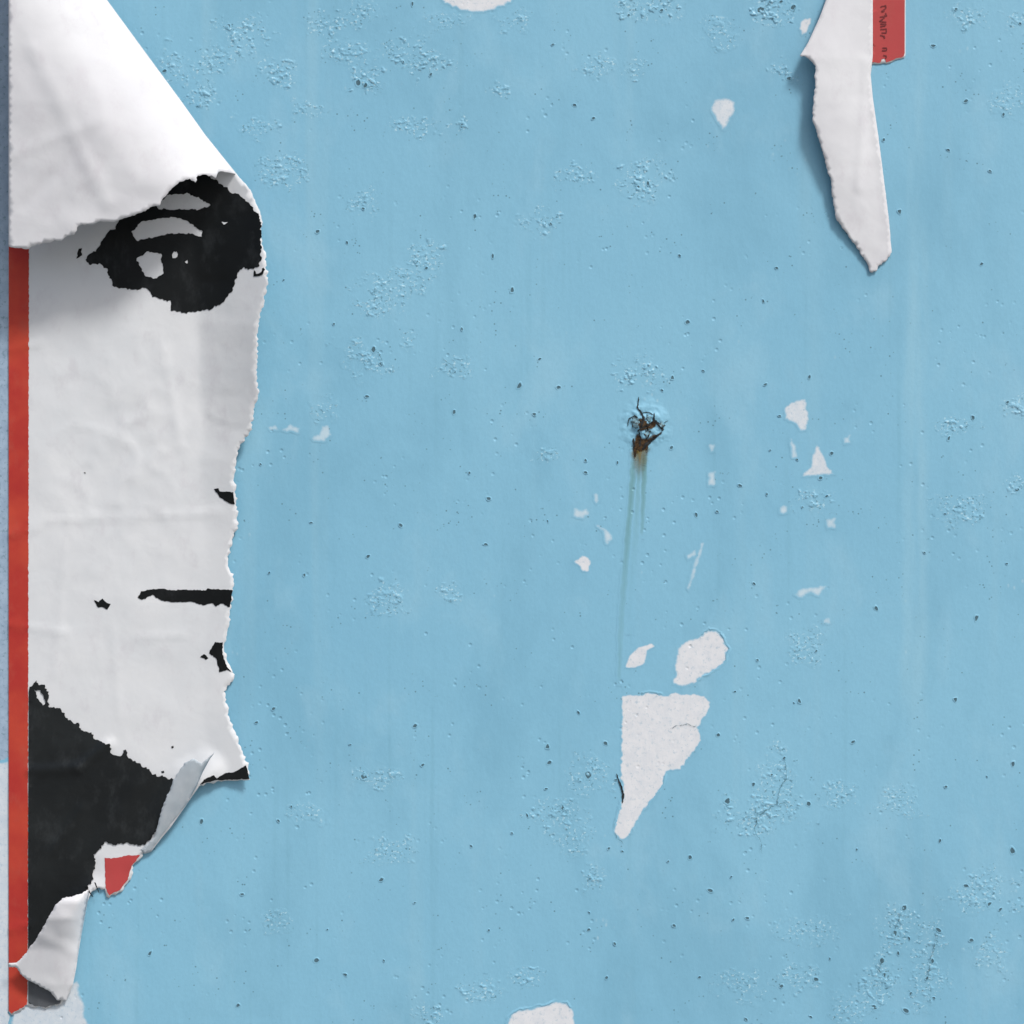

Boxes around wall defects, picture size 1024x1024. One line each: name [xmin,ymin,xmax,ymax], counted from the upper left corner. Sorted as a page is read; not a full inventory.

peeling [441,0,514,13]
peeling [709,95,737,131]
peeling [777,397,811,433]
peeling [795,443,836,481]
spalling [602,626,732,853]
crack [745,761,788,846]
peeling [504,999,576,1024]